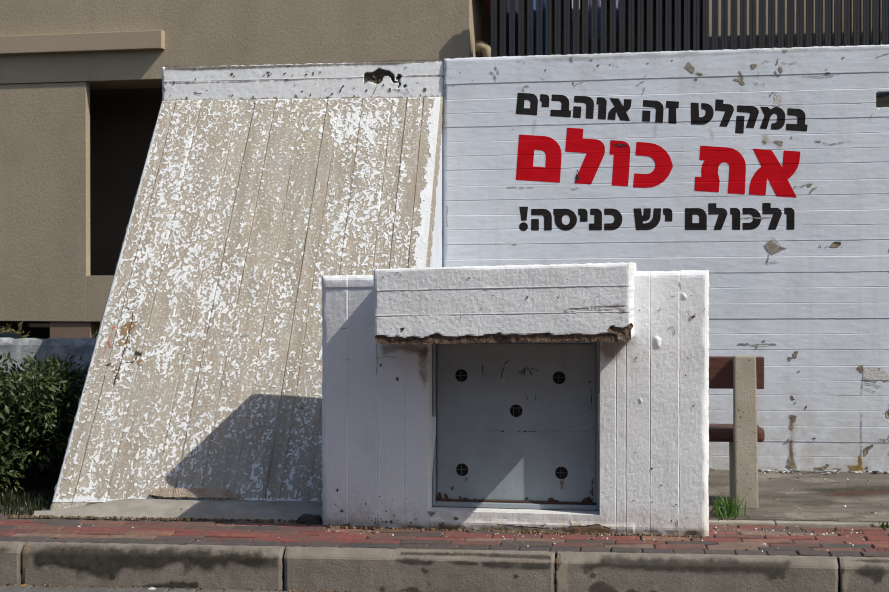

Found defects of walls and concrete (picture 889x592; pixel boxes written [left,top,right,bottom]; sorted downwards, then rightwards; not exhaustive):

peeling [764,236,787,263]
peeling [52,67,441,507]
spalling [564,296,625,312]
spalling [375,323,633,345]
peeling [758,415,889,474]
rust [435,517,612,534]
damp [35,547,276,579]
damp [584,557,789,592]